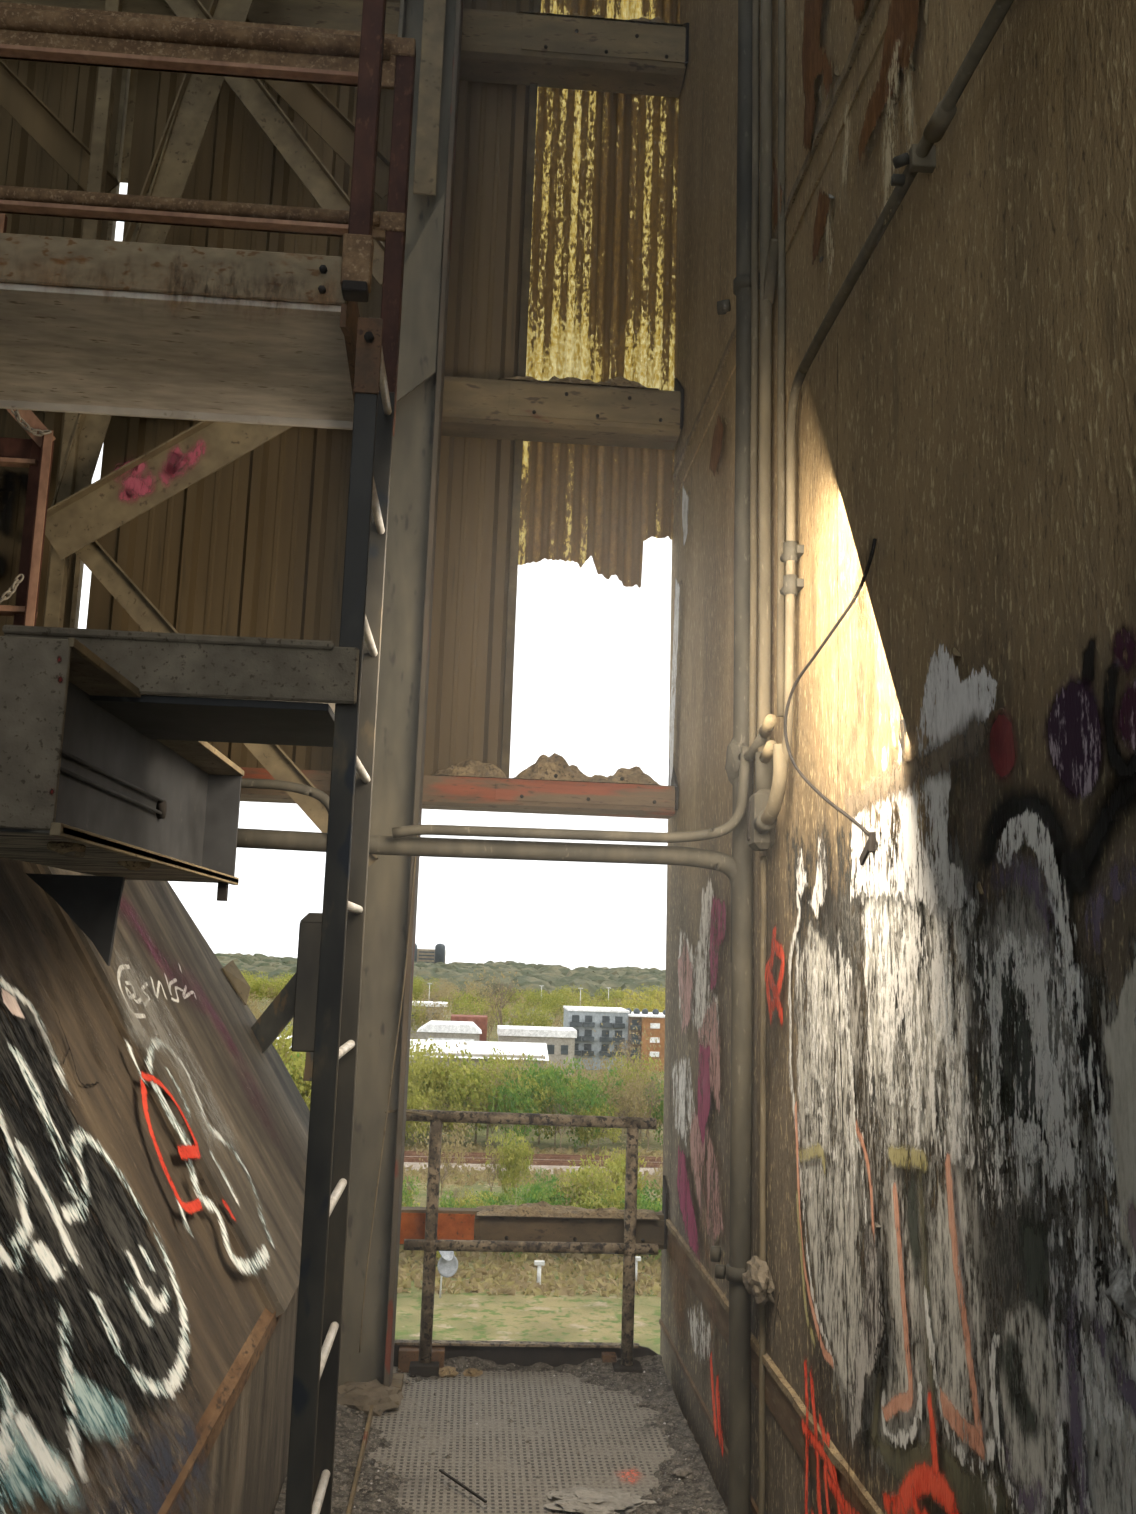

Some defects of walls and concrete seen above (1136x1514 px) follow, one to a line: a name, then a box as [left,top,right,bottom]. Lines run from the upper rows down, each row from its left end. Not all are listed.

peeling [802,0,839,150]
peeling [858,0,929,165]
peeling [812,189,835,264]